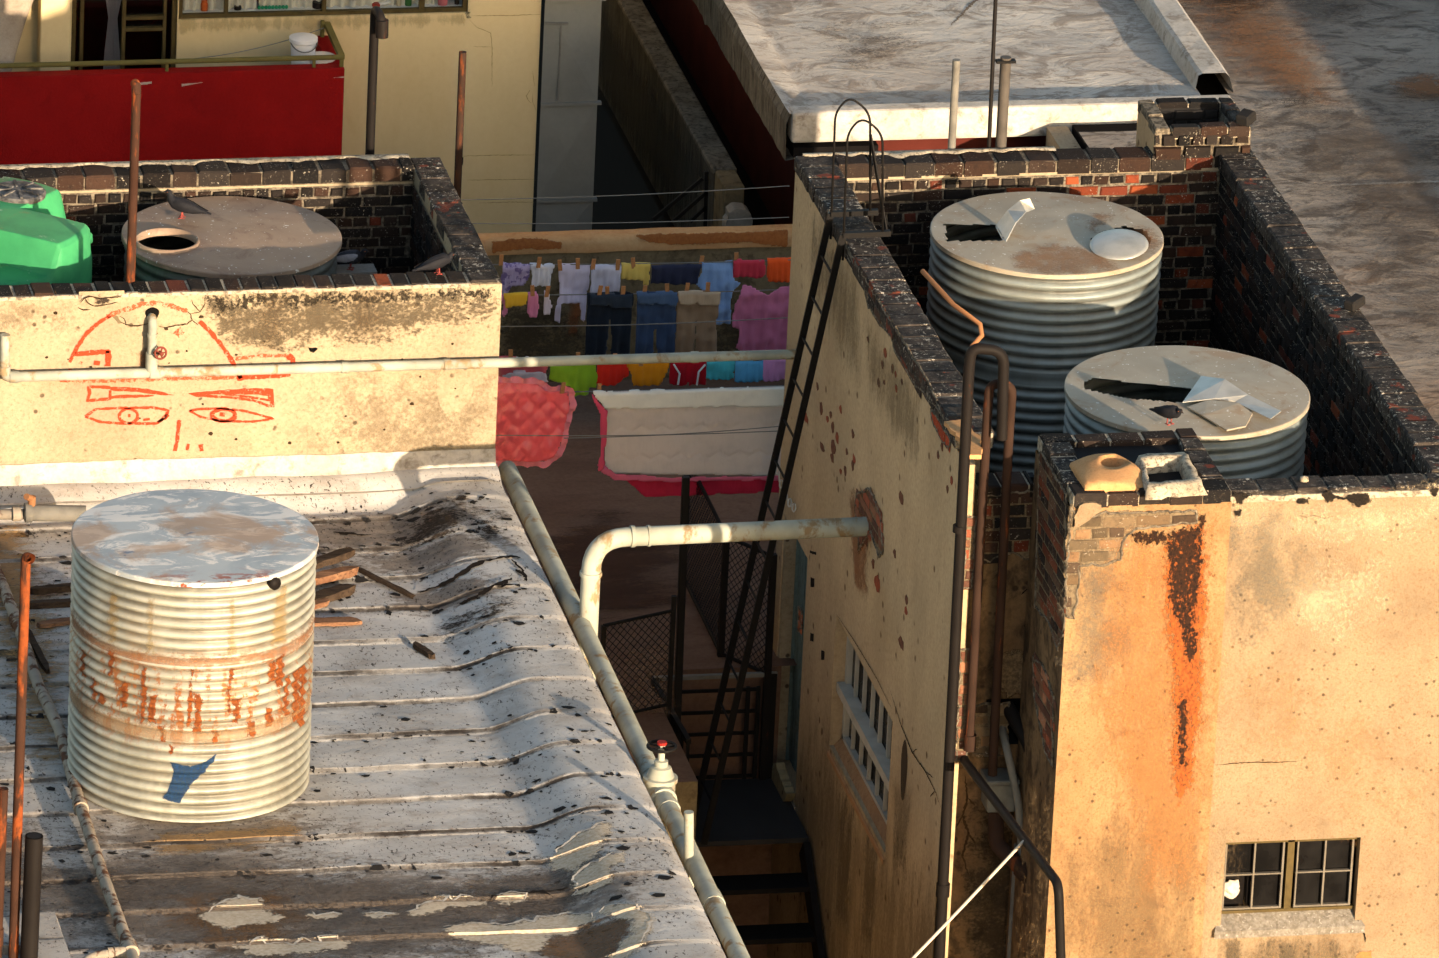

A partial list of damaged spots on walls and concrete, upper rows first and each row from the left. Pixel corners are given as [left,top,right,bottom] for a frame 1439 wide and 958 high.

spalling [804,382,856,476]
flaking render [854,487,896,592]
flaking render [963,451,1199,651]
flaking render [955,648,1056,768]
corrosion [1132,513,1213,806]
peeling [199,895,351,957]
peeling [362,821,655,958]